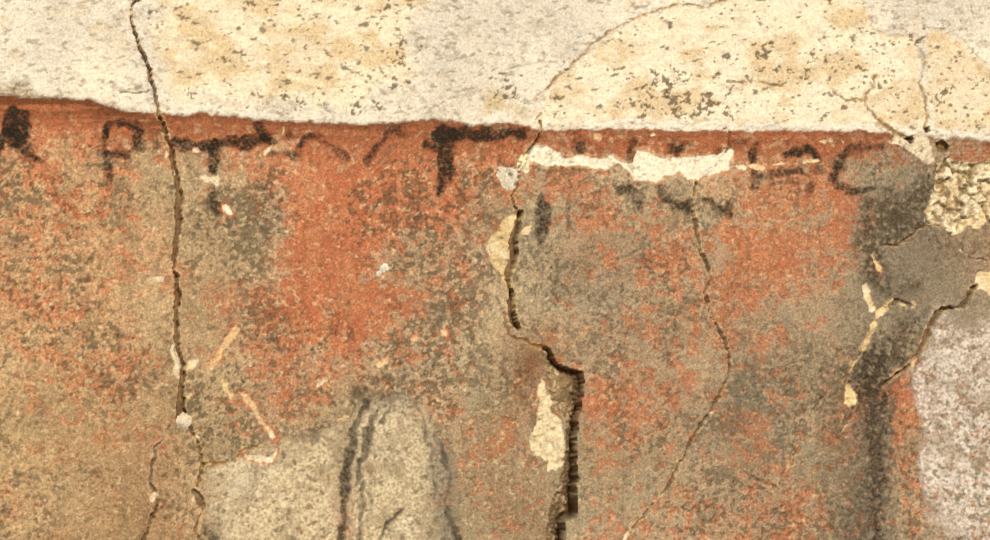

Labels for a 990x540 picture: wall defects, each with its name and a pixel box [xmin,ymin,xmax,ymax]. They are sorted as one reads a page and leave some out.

crack [120,0,266,540]
crack [485,0,734,540]
flaking render [469,0,990,237]
crack [726,80,788,89]
crack [832,61,931,139]
crack [812,221,990,436]
crack [981,204,990,223]
crack [734,435,799,540]